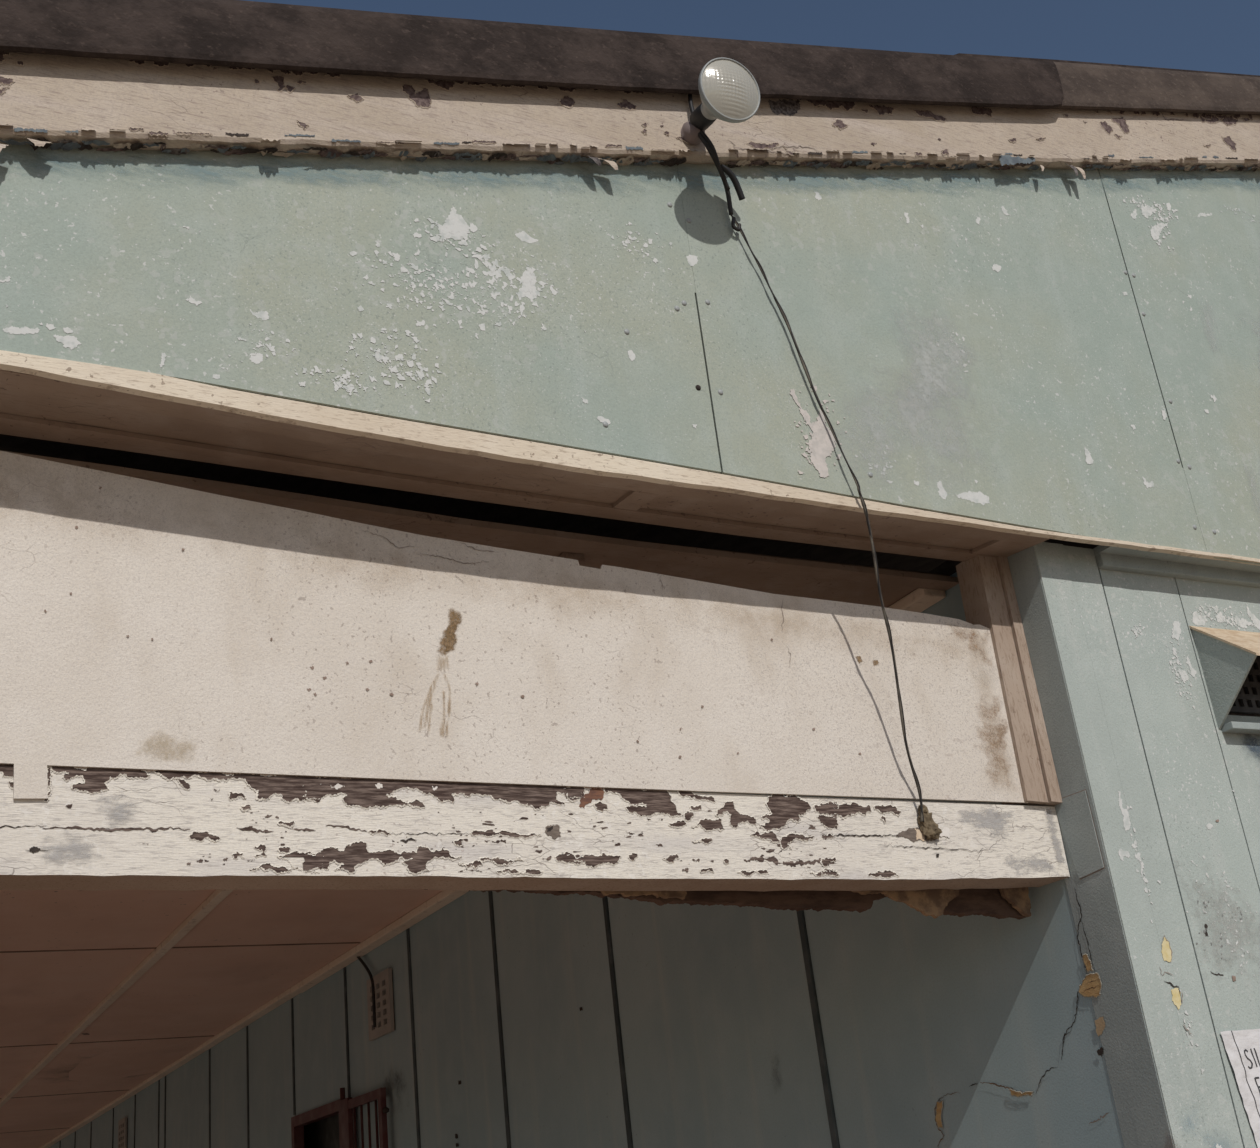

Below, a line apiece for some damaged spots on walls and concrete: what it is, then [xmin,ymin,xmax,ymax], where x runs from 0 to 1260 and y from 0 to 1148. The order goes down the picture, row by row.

peeling [0,119,698,170]
peeling [401,79,577,108]
peeling [768,99,895,130]
peeling [725,137,1044,171]
peeling [1065,110,1260,179]
peeling [295,207,559,402]
peeling [212,309,297,379]
peeling [790,386,847,478]
leakage [438,610,461,655]
peeling [0,764,13,789]
peeling [43,766,902,878]
crack [934,887,1102,1143]